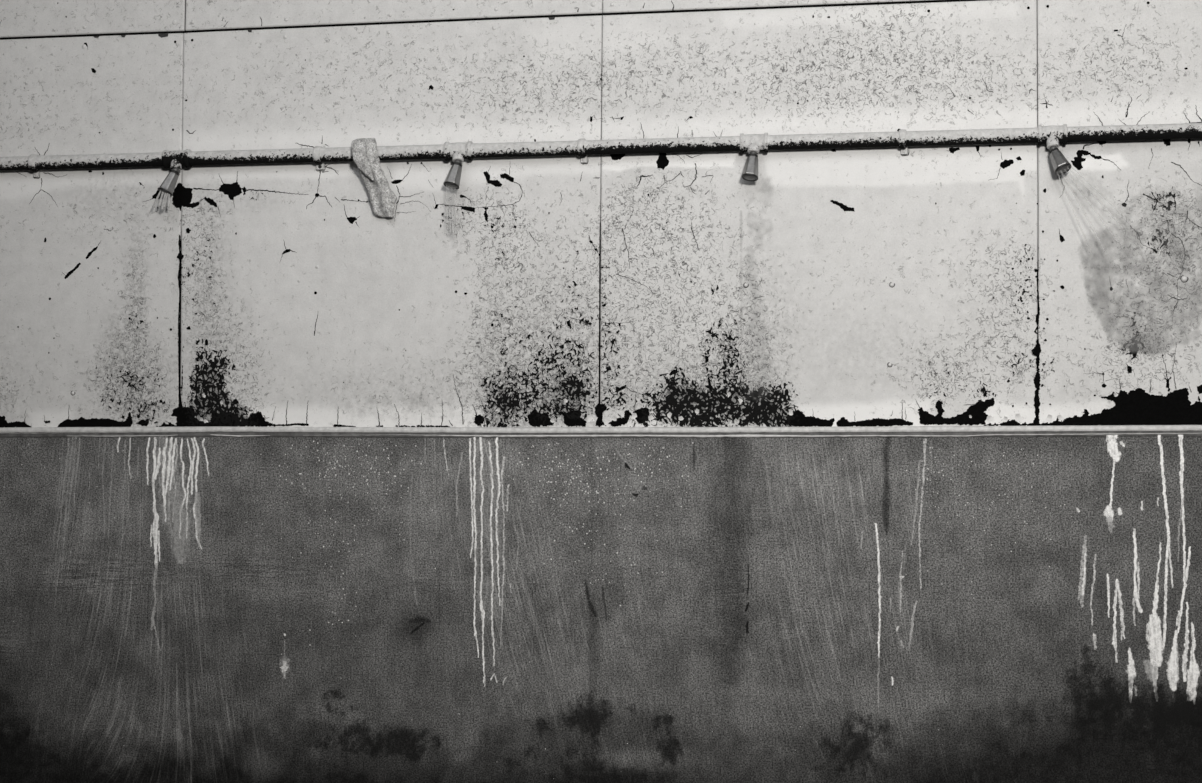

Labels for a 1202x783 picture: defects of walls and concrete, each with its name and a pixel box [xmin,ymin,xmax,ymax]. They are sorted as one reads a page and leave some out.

damp [181,223,216,323]
mould [1140,187,1181,264]
damp [1119,311,1151,361]
damp [96,339,262,651]
damp [425,266,803,687]